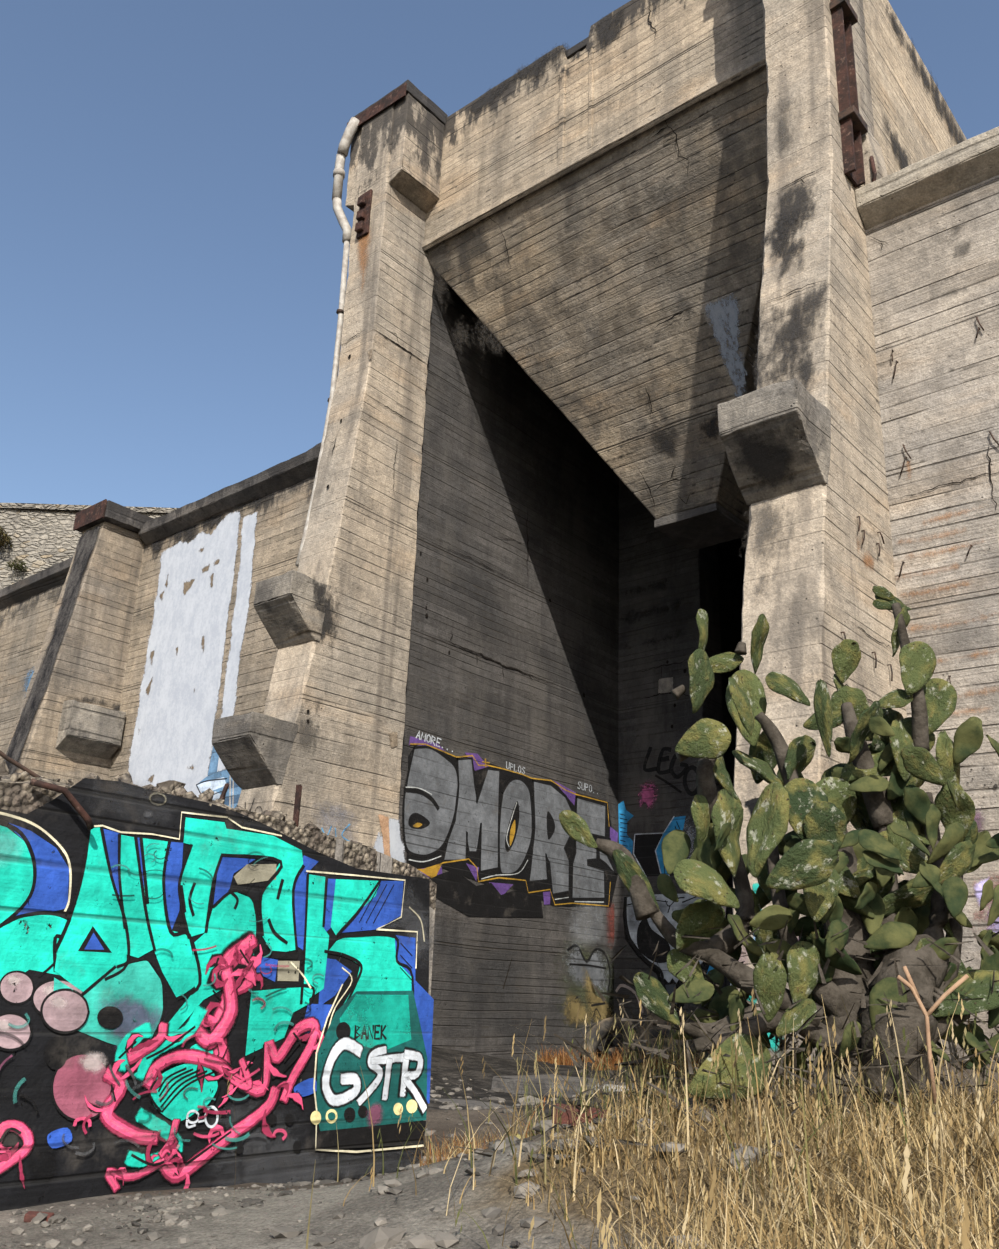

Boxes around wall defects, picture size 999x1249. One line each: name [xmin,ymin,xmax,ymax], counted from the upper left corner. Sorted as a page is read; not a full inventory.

leakage [596,10,622,49]
leakage [471,45,568,113]
leakage [763,183,815,275]
crack [894,438,998,514]
peeling [128,511,257,797]